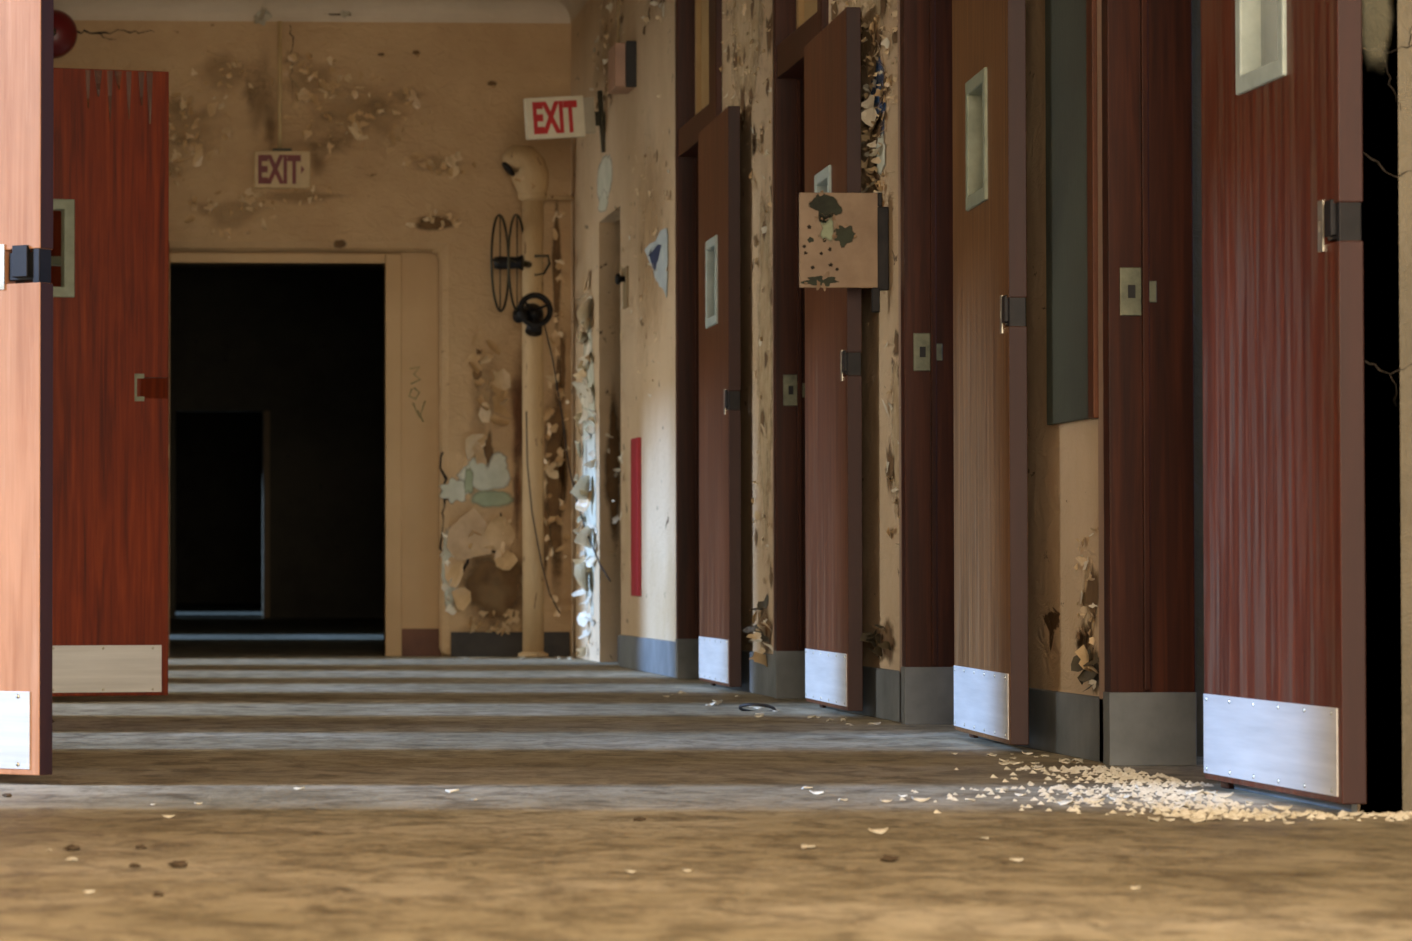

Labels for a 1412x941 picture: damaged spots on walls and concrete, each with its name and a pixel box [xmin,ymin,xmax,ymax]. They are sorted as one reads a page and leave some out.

peeling [169,46,254,167]
peeling [831,0,898,197]
peeling [719,0,773,667]
peeling [801,190,858,291]
flaking render [440,329,522,636]
peeling [1071,528,1100,691]